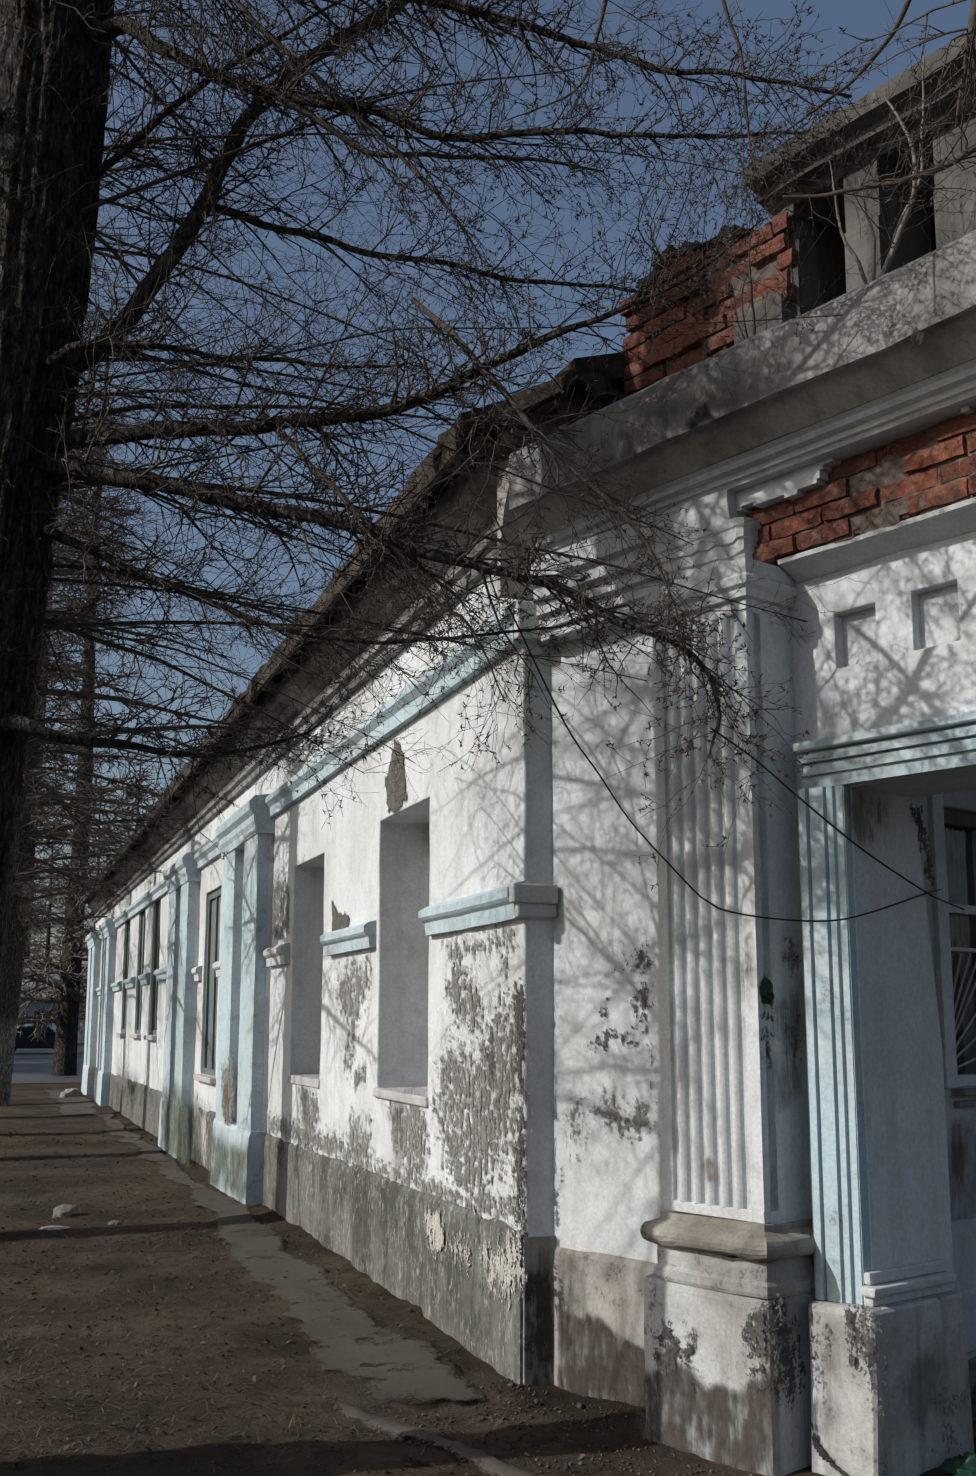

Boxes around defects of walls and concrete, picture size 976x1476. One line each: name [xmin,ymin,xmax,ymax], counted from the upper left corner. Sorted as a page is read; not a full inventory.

spalling [619,202,824,396]
spalling [746,410,976,568]
spalling [385,735,407,813]
peeling [266,922,534,1310]
peeling [557,939,660,1162]
water stain [524,1267,806,1476]